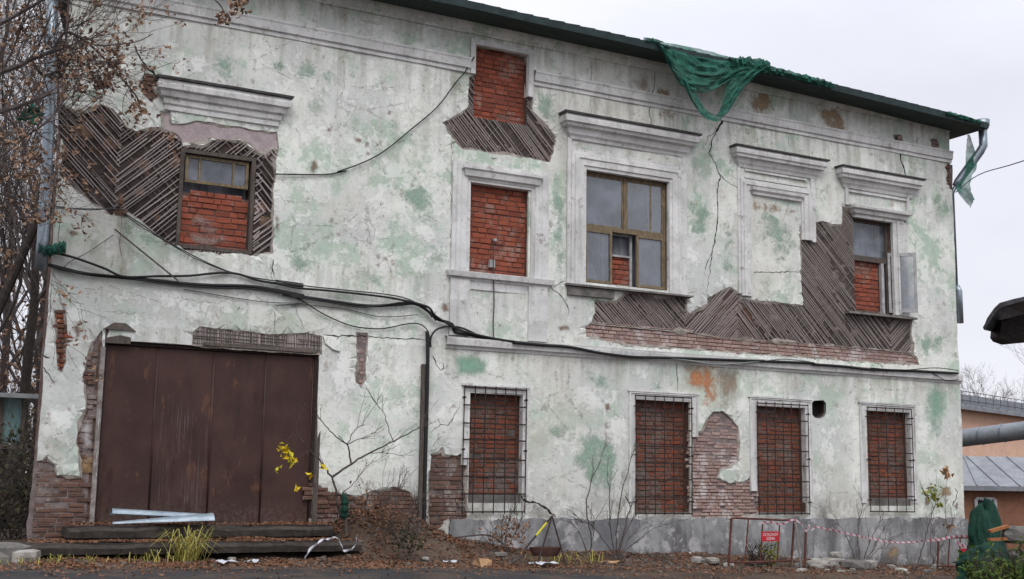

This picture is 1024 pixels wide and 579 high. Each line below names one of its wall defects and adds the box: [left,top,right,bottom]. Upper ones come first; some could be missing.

flaking render [58,73,279,256]
flaking render [443,76,556,162]
crack [705,121,736,287]
flaking render [585,206,919,365]
flaking render [53,310,79,372]
flaking render [354,332,368,386]
water stain [457,357,484,373]
corrosion [690,366,716,405]
flaking render [26,330,102,543]
flaking render [302,447,473,538]
water stain [577,436,615,489]
flaking render [684,411,759,519]